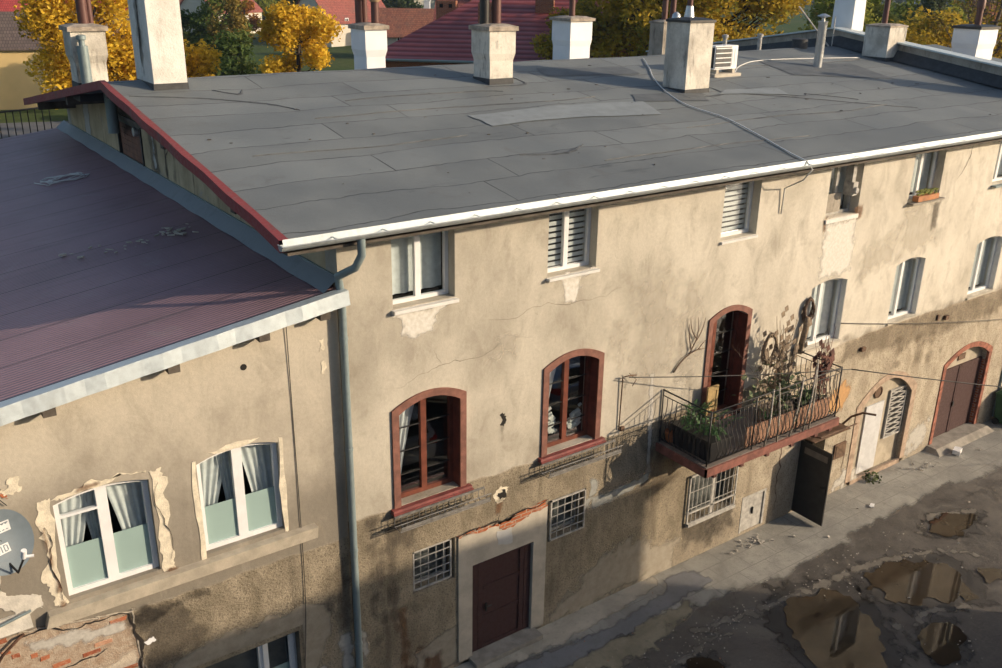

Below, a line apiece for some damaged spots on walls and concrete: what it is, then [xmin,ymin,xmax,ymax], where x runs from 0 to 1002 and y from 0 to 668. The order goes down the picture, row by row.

peeling [208,438,258,454]
peeling [0,467,176,614]
peeling [192,461,207,560]
peeling [278,437,289,532]
leakage [381,513,422,569]
flaking render [457,499,548,539]
leakage [586,473,649,508]
flaking render [0,608,156,668]
crack [22,613,145,668]
leakage [144,602,203,668]